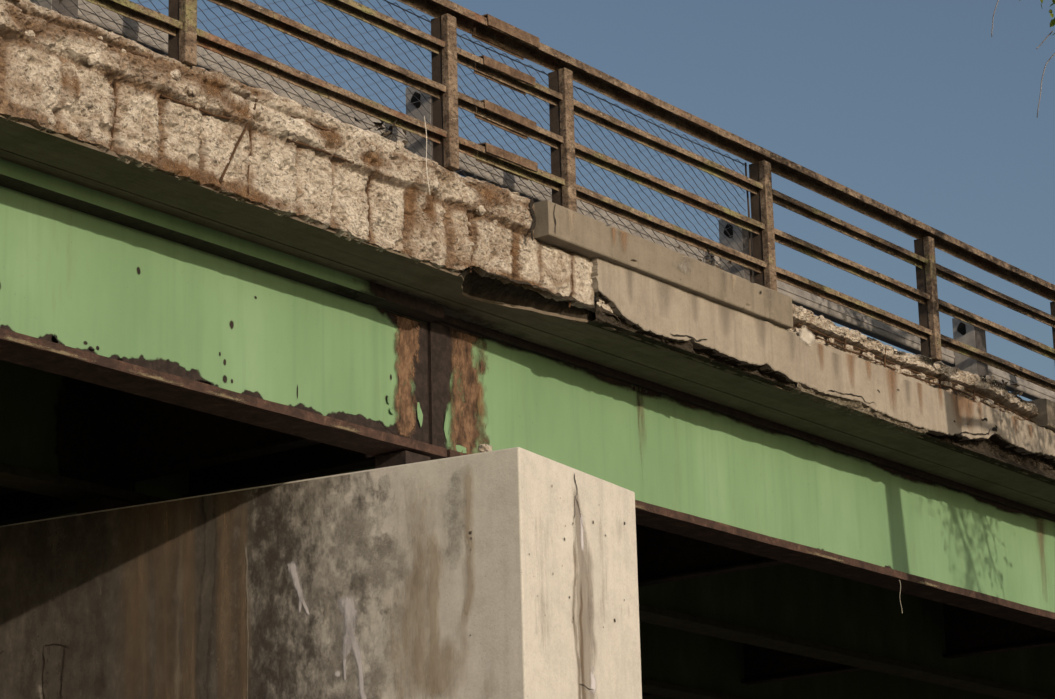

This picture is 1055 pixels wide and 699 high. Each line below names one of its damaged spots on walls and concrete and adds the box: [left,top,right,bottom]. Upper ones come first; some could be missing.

spalling [0,0,1055,486]
rust [289,281,786,454]
crack [670,333,707,342]
damp [0,475,404,699]
damp [573,496,596,699]
rust [868,461,1043,543]